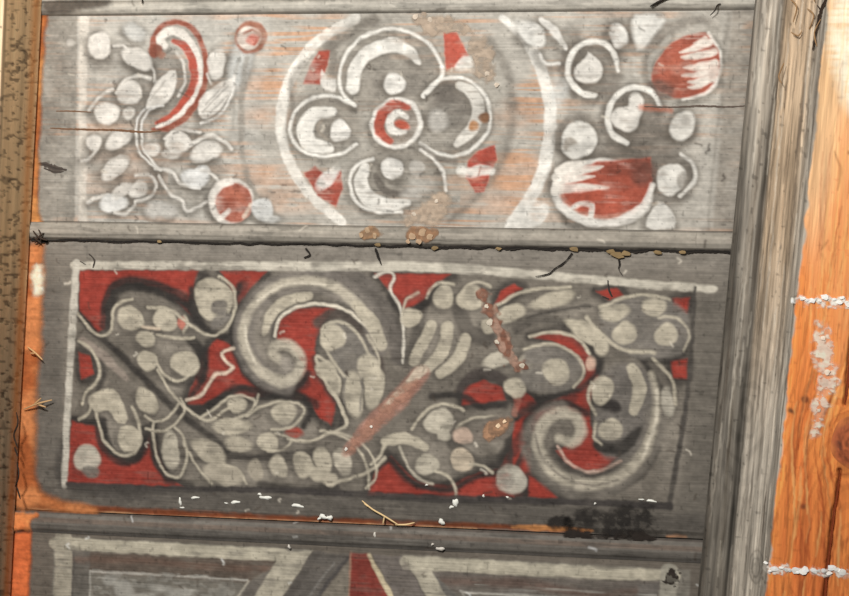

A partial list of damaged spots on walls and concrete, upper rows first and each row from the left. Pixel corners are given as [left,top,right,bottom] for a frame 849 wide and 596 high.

crack [812,0,827,50]
peeling [359,226,380,240]
water stain [791,294,849,309]
crack [841,361,849,405]
water stain [547,506,656,541]
crack [824,470,840,596]
water stain [763,561,848,578]